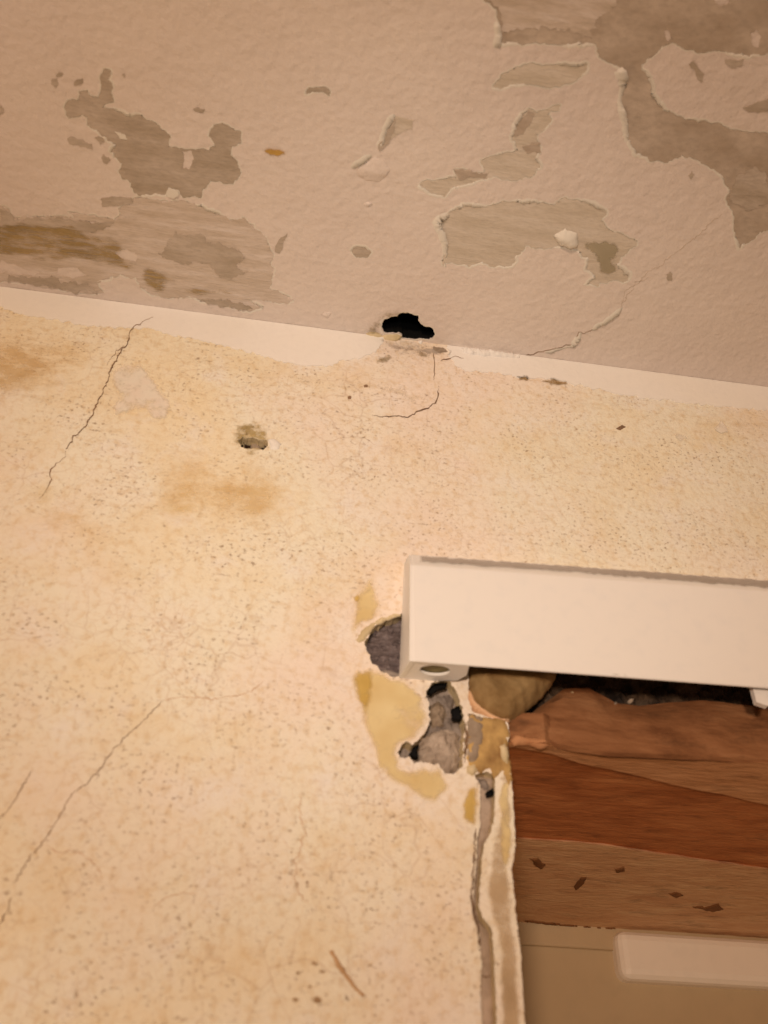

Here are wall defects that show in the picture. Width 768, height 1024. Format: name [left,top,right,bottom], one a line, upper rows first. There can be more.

peeling [0,67,294,314]
peeling [417,103,639,288]
peeling [482,0,768,251]
crack [39,318,150,499]
spalling [236,425,282,450]
crack [373,354,460,418]
crack [0,683,262,923]
spalling [356,614,402,677]
spalling [398,682,513,785]